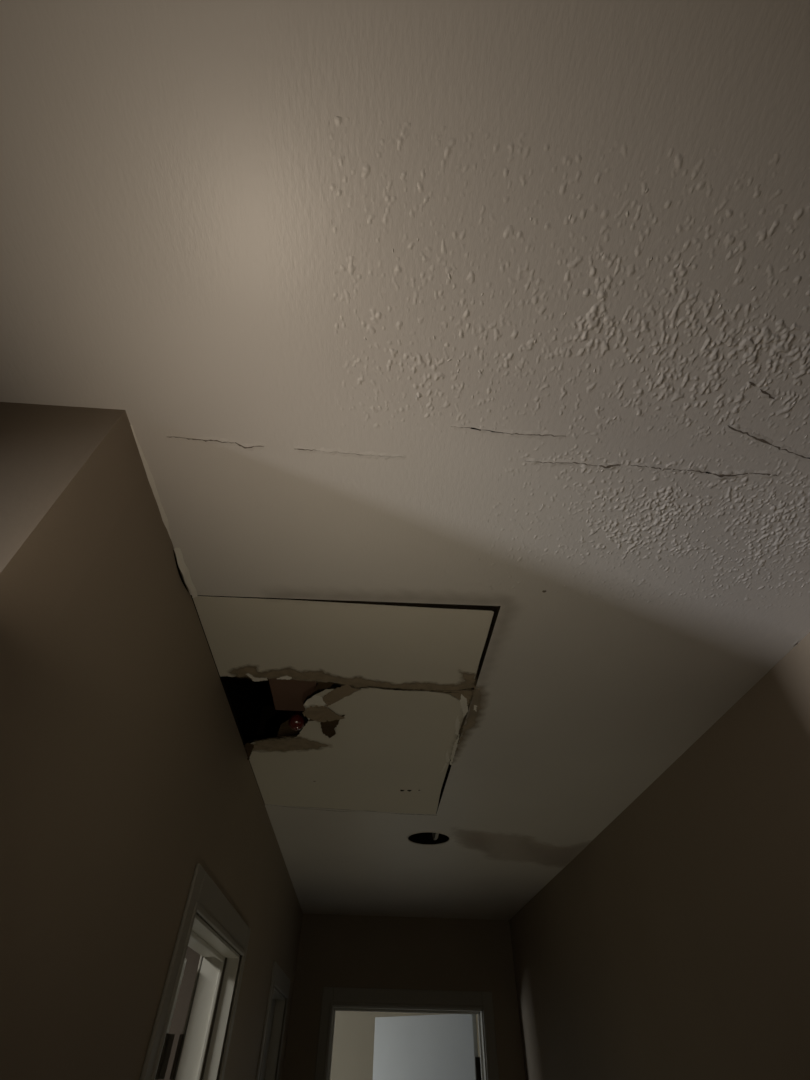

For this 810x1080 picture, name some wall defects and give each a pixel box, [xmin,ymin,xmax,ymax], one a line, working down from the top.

crack [166,433,264,451]
crack [450,423,810,480]
peeling [320,715,345,738]